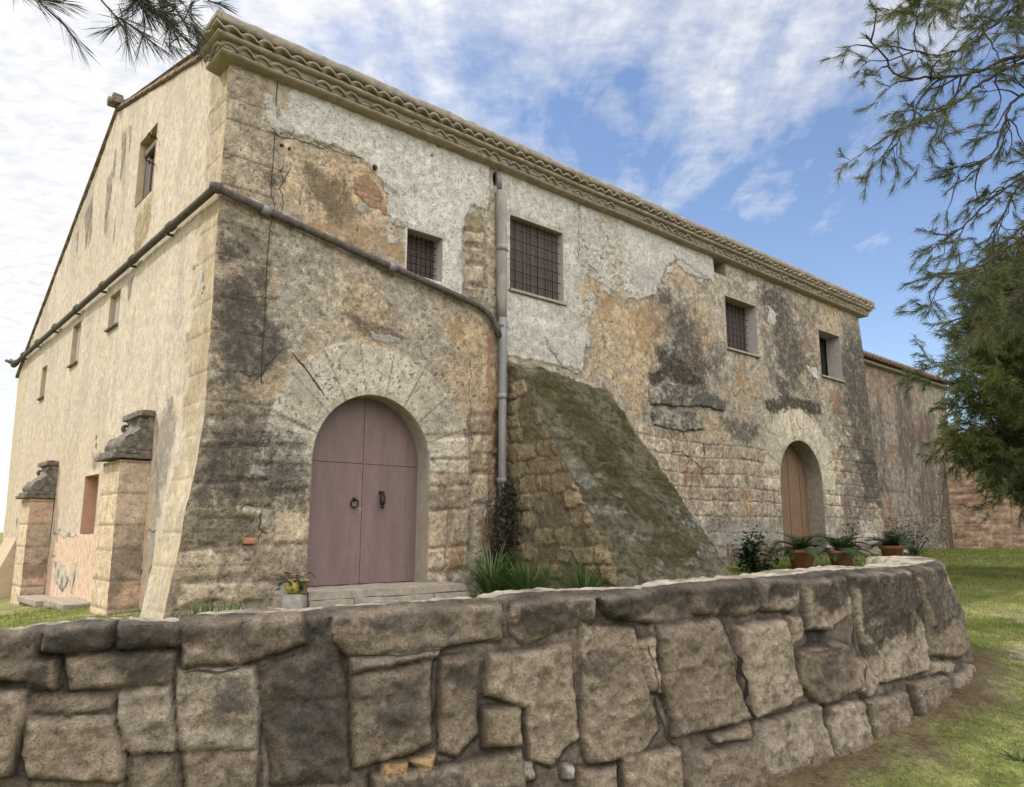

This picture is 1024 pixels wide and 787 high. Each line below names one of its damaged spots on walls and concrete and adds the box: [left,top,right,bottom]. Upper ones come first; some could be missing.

crack [267,130,365,209]
peeling [579,206,617,314]